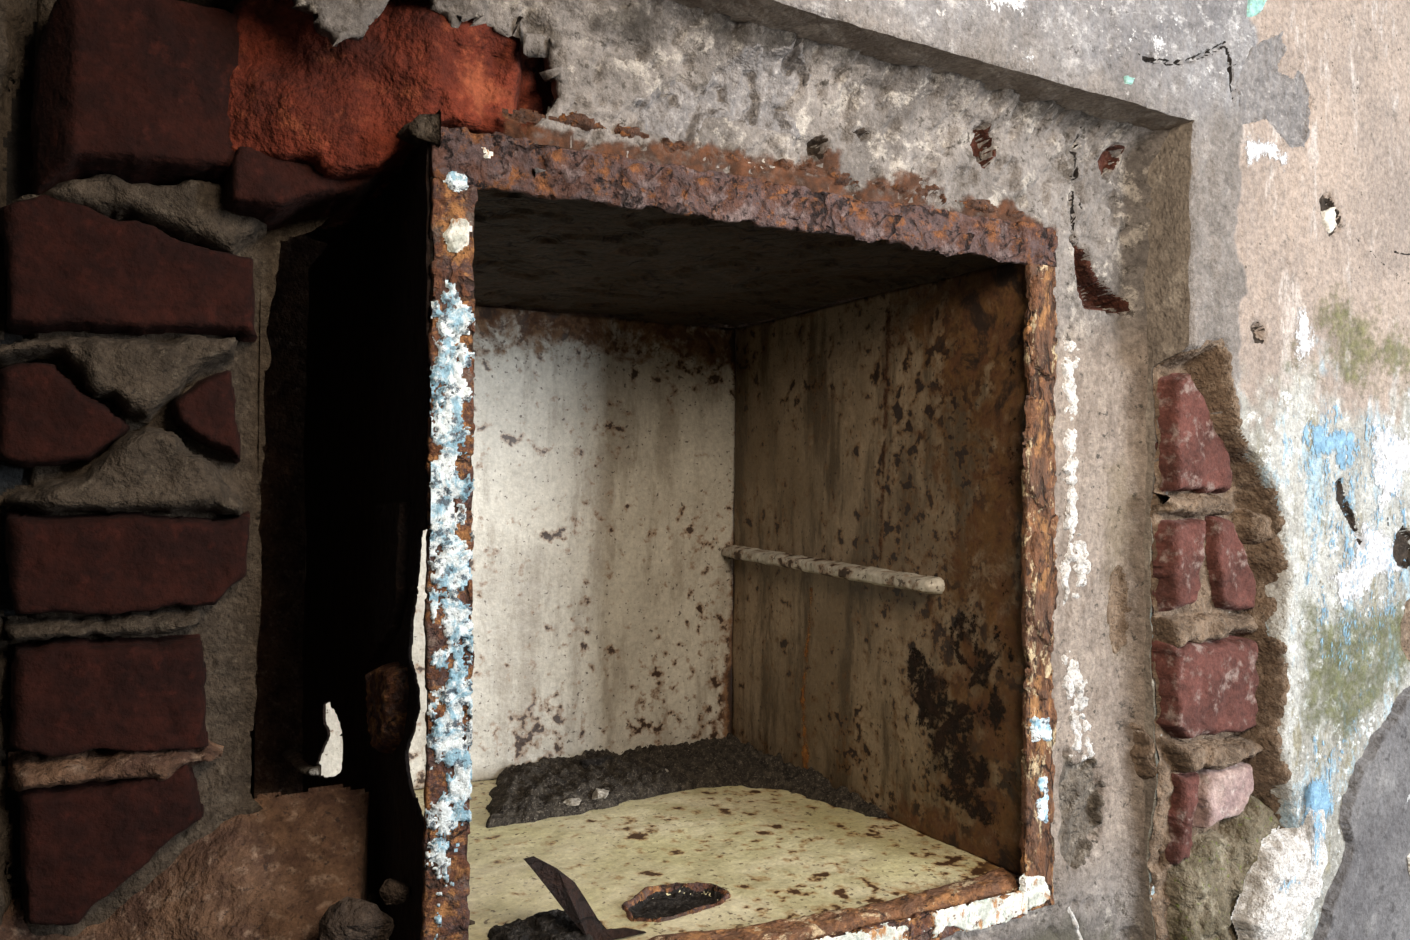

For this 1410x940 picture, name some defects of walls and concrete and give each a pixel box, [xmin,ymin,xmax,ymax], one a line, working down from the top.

crack [1138,41,1236,99]
corrosion [502,108,1056,231]
spalling [250,233,328,799]
spalling [1107,565,1132,654]
spalling [1129,338,1328,940]
spalling [1400,599,1410,662]